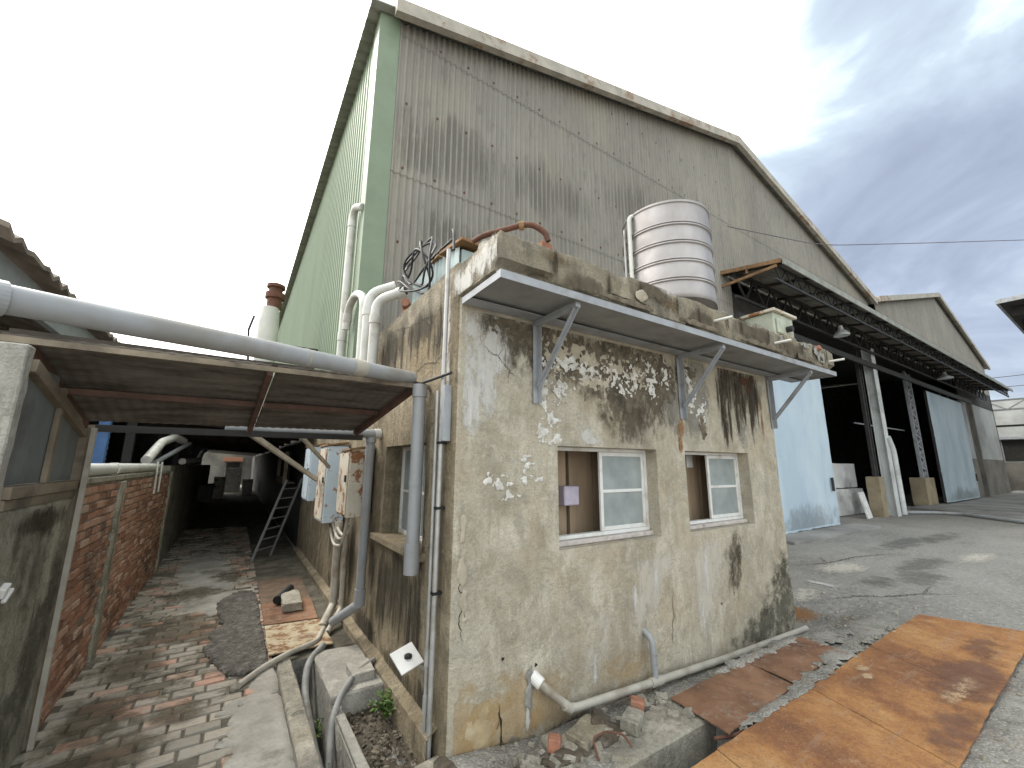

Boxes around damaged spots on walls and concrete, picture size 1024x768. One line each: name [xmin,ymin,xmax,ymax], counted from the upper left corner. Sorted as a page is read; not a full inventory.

spalling [482,315,709,447]
water stain [715,368,764,446]
peeling [483,451,543,511]